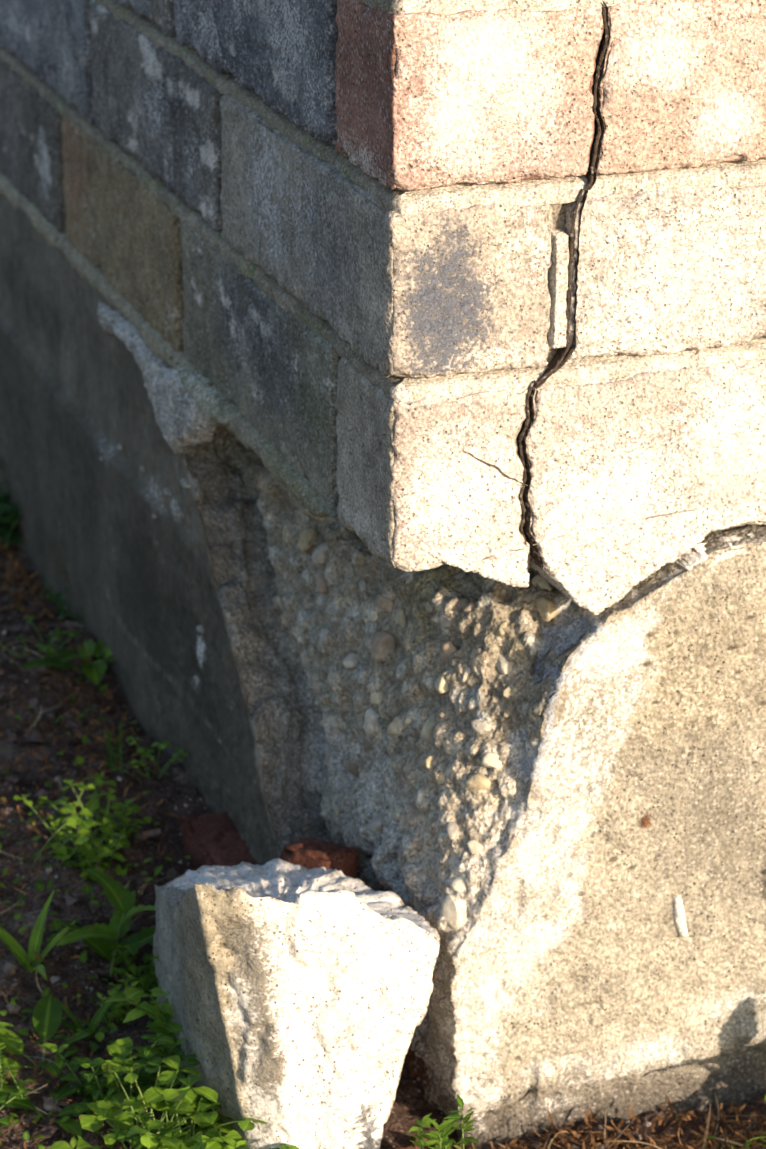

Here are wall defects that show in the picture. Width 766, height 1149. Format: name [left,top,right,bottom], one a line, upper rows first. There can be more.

crack [463,0,698,572]
peeling [0,562,117,826]
spalling [140,426,766,1141]
peeling [23,1062,78,1149]